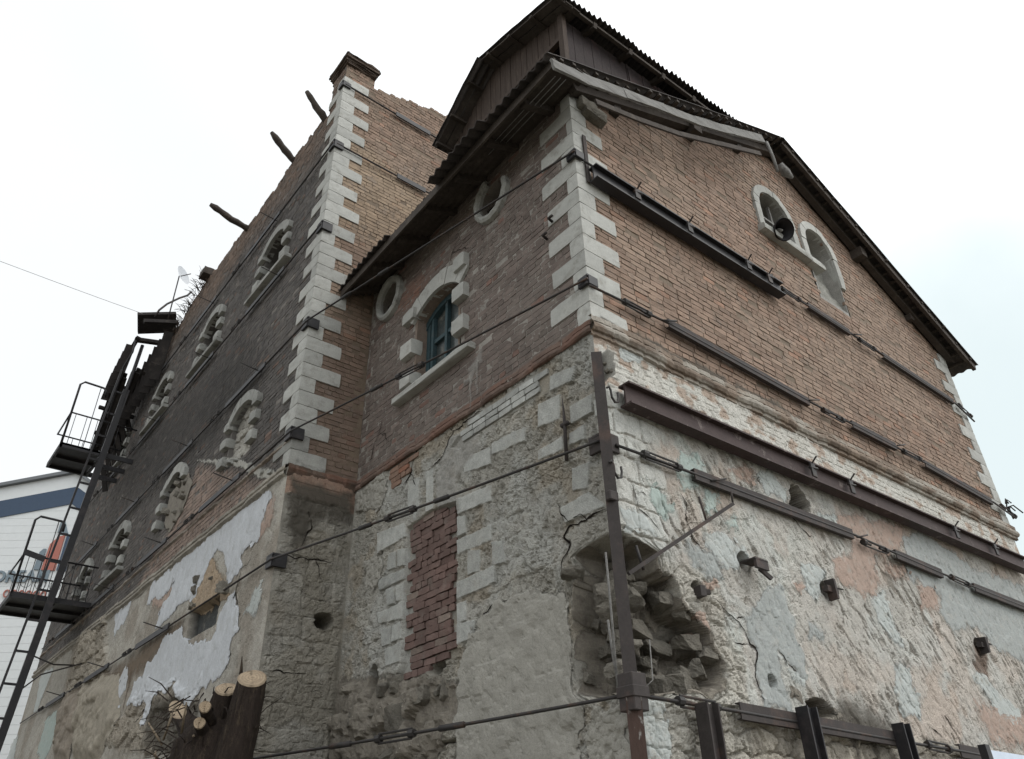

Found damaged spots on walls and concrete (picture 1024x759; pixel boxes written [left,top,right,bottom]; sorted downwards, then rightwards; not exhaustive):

peeling [114,457,274,726]
peeling [327,506,727,759]
crack [558,505,604,567]
crack [714,598,797,694]